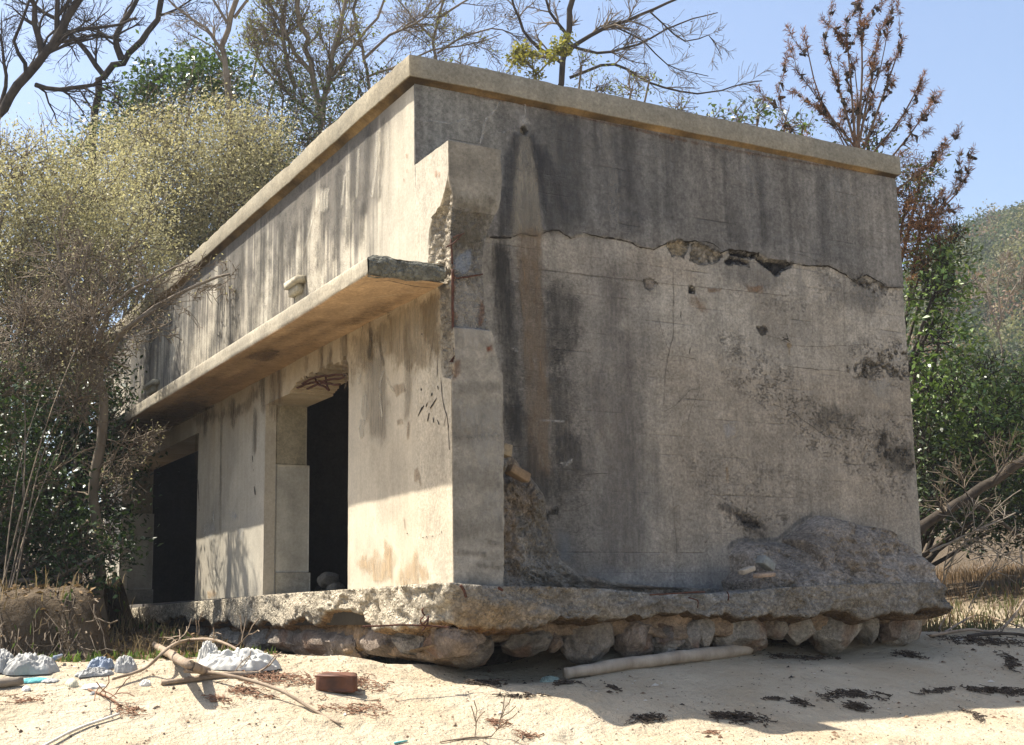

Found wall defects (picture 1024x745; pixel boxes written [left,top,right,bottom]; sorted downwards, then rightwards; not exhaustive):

crack [490,230,759,257]
leakage [255,222,347,319]
spalling [450,239,483,329]
crack [787,252,904,288]
leakage [495,138,581,498]
spalling [296,373,348,391]
spalling [362,607,449,631]